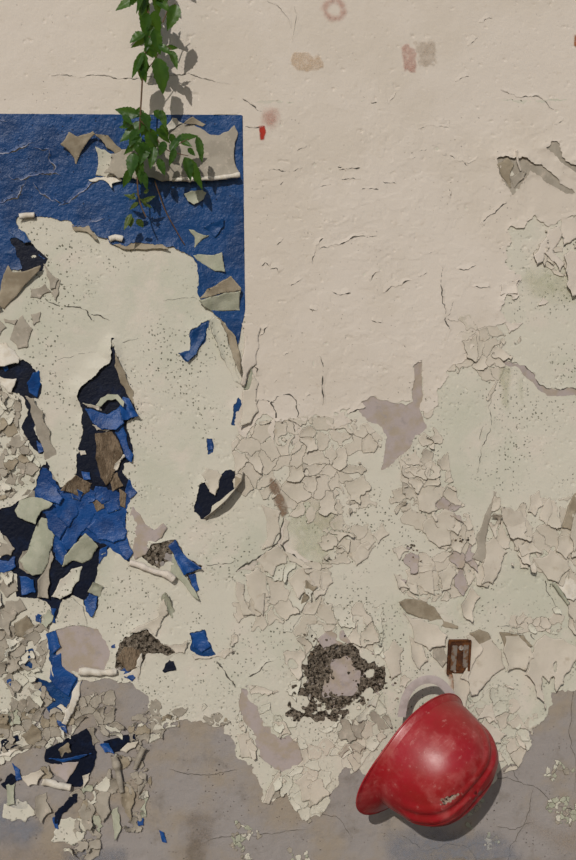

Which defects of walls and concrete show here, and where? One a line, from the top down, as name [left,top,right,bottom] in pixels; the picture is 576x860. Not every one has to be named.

crack [53,69,270,139]
peeling [60,117,240,204]
peeling [497,150,575,195]
peeling [546,141,576,172]
crack [502,358,576,396]
peeling [0,212,238,860]
peeling [178,215,576,830]
crack [401,690,576,860]